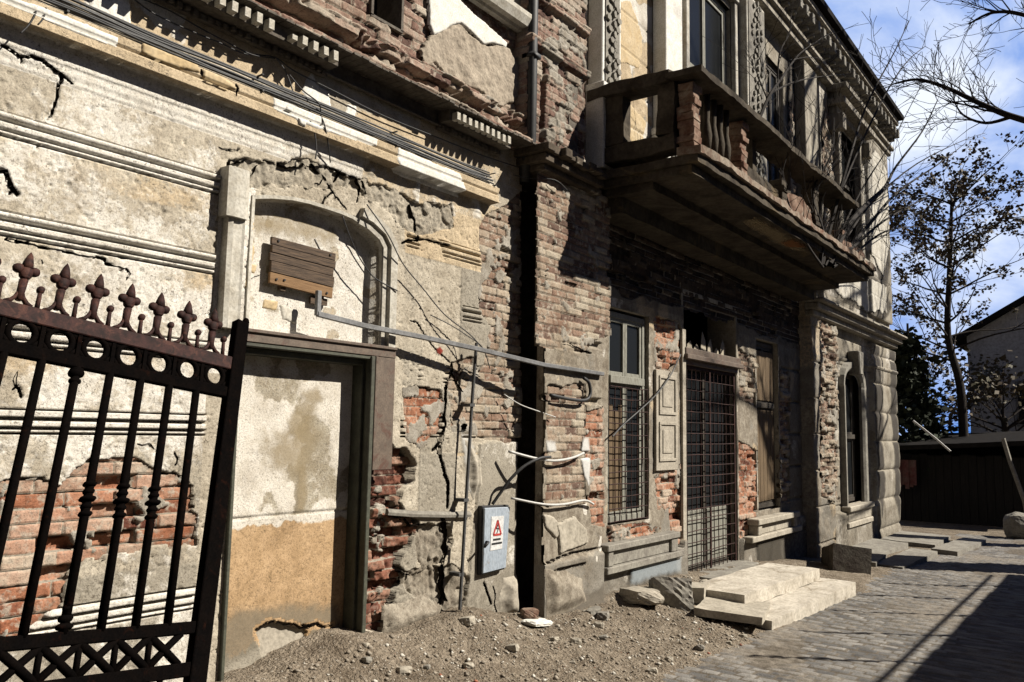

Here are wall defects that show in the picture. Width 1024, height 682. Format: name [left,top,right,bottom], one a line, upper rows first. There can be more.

crack [0,45,74,119]
flaking render [252,0,592,162]
crack [0,169,19,196]
crack [219,147,366,210]
spalling [226,158,454,235]
peeling [262,299,299,324]
flaking render [0,457,198,637]
damp [275,390,320,508]
flaking render [366,192,522,631]
flaking render [542,383,682,554]
flaking render [738,441,759,538]
flaking render [818,319,840,503]